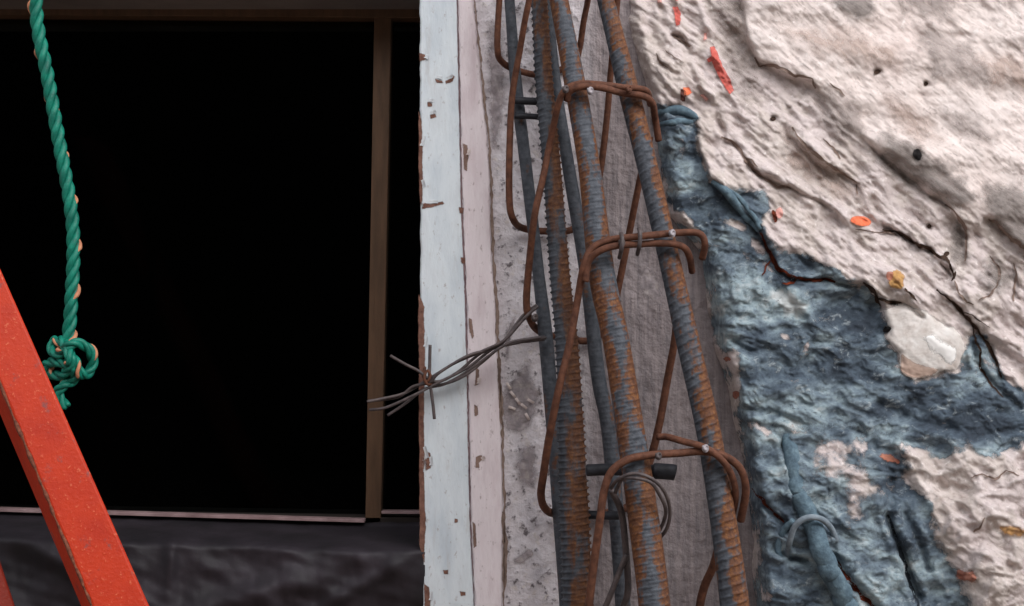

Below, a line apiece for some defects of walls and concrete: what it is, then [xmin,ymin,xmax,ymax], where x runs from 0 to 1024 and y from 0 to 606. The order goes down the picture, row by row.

spalling [488,26,504,145]
peeling [418,98,444,209]
flaking render [463,144,471,171]
crack [760,232,836,285]
flaking render [883,303,965,380]
spalling [503,367,538,431]
spalling [517,448,535,485]
spalling [514,550,533,563]